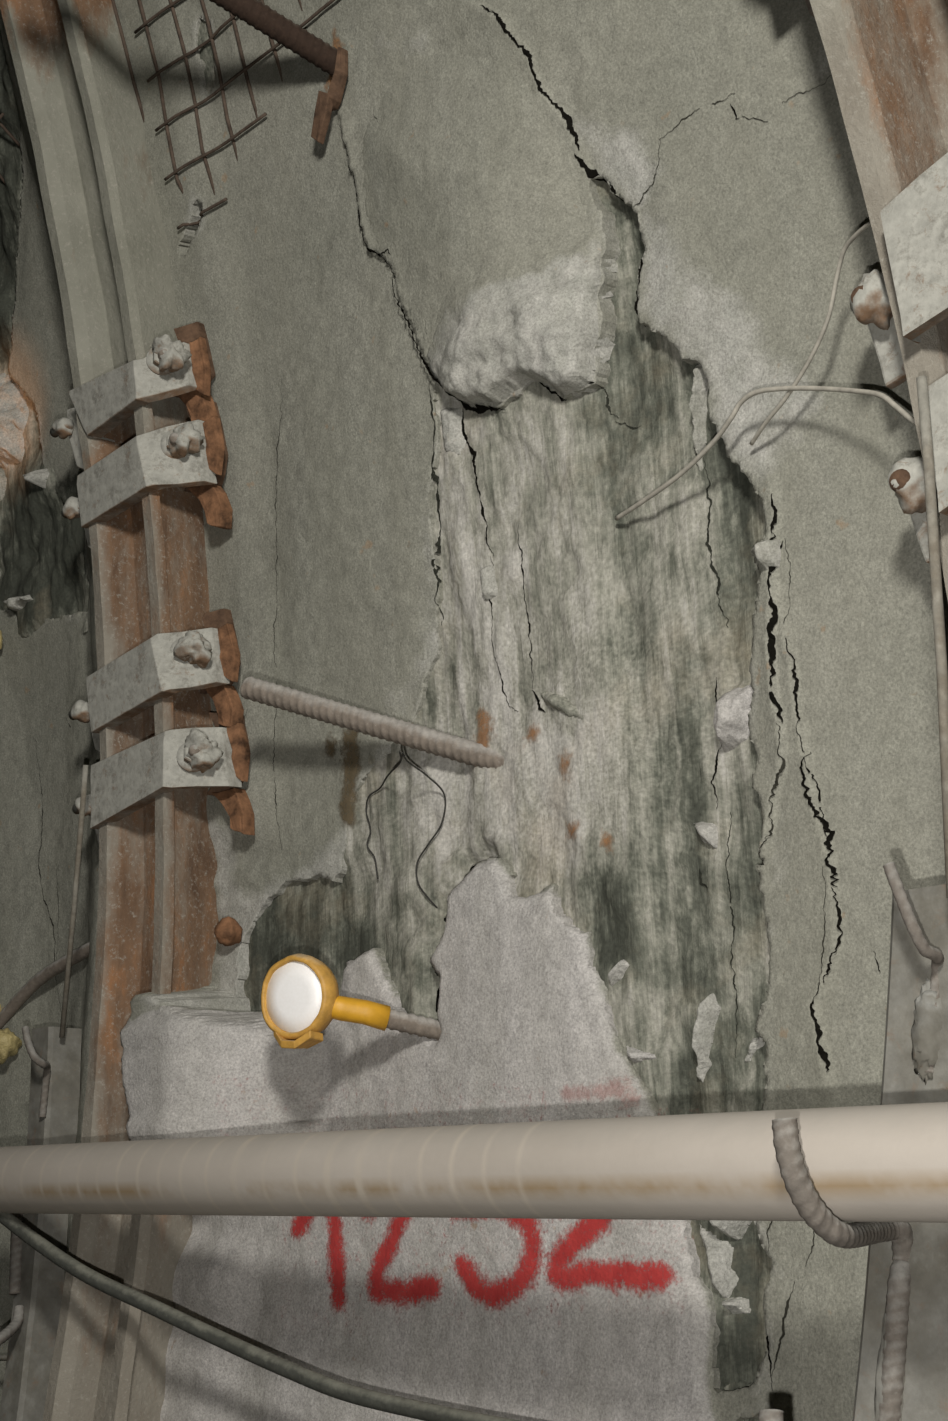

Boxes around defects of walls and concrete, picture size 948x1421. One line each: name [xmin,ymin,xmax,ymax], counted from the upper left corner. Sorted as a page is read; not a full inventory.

crack [480,5,831,215]
spalling [0,32,90,637]
crack [540,382,640,429]
crack [634,259,646,327]
crack [703,457,729,628]
spalling [244,182,781,1115]
crack [699,494,880,1072]
spalling [690,1220,772,1391]
crack [766,1230,815,1386]